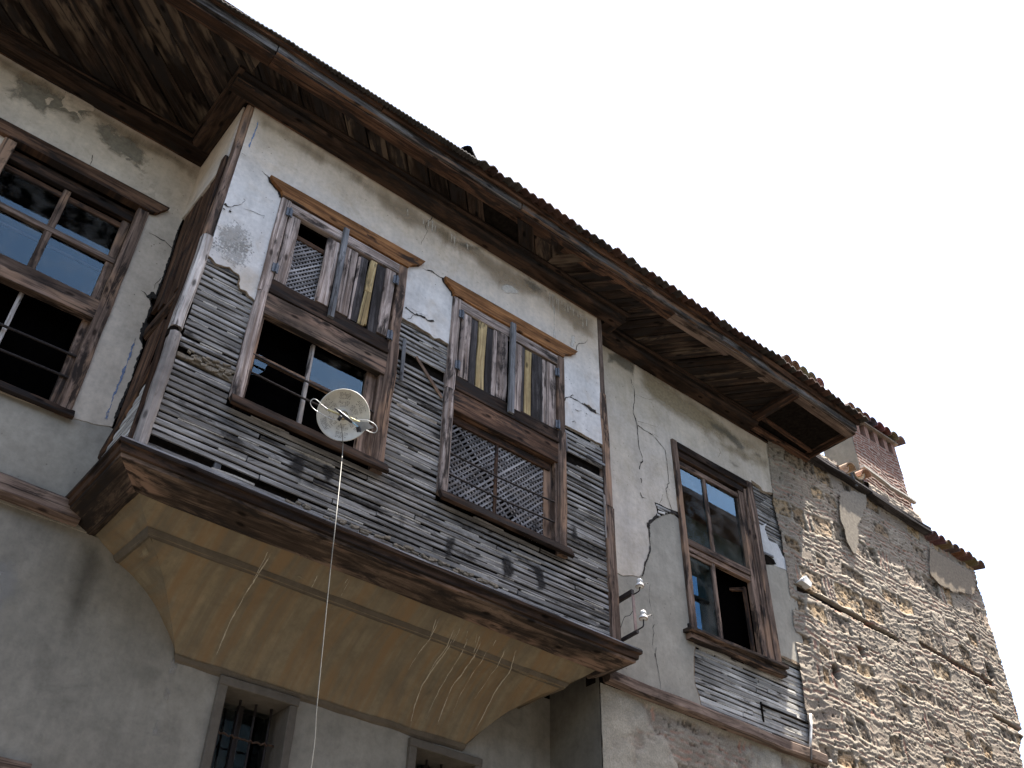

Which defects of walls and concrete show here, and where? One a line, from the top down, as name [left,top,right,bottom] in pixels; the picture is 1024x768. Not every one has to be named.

water stain [10,72,87,121]
water stain [98,125,160,164]
crack [223,171,281,216]
crack [565,395,596,422]
flaking render [147,256,610,636]
crack [631,380,679,687]
flaking render [652,502,678,521]